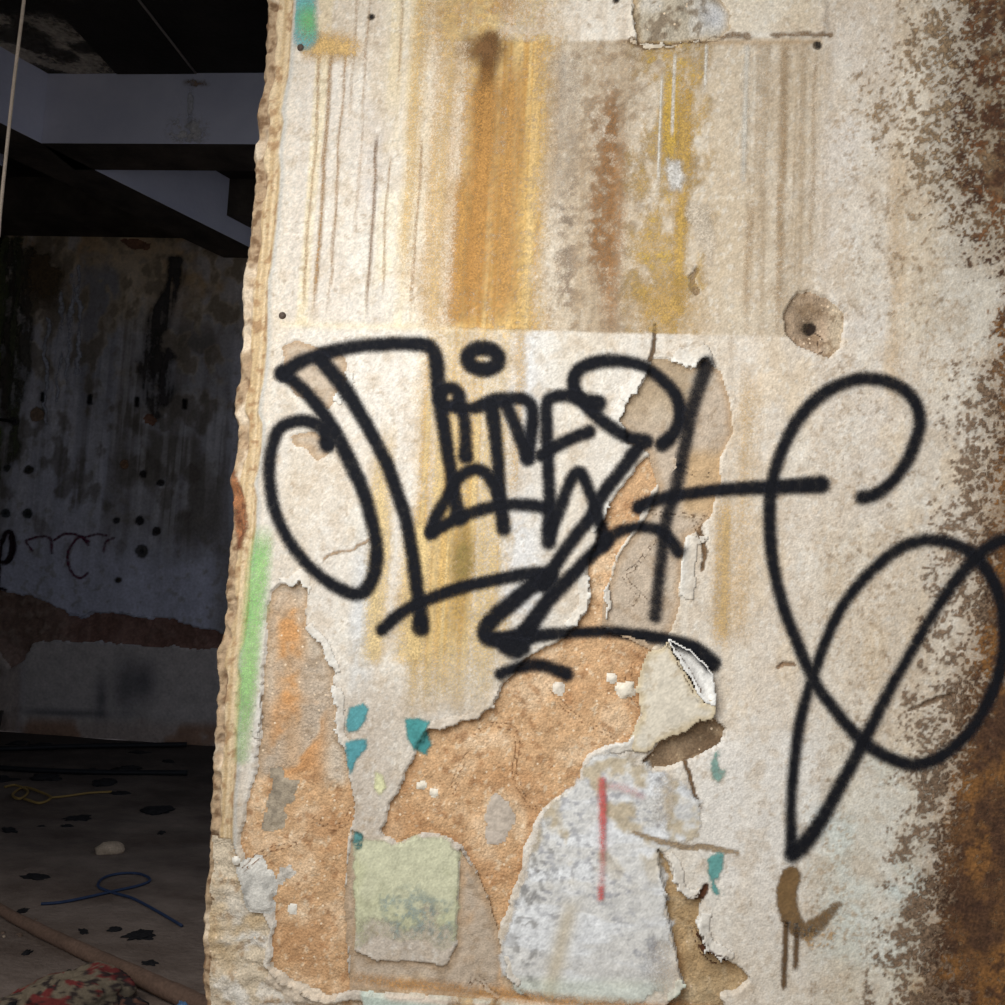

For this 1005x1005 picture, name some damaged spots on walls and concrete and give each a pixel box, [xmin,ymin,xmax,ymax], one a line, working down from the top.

corrosion [402,0,561,330]
water stain [0,235,84,464]
water stain [137,256,183,419]
spalling [783,292,844,358]
flaking render [0,590,224,668]
flaking render [208,341,748,1005]
corrosion [864,307,1005,1005]